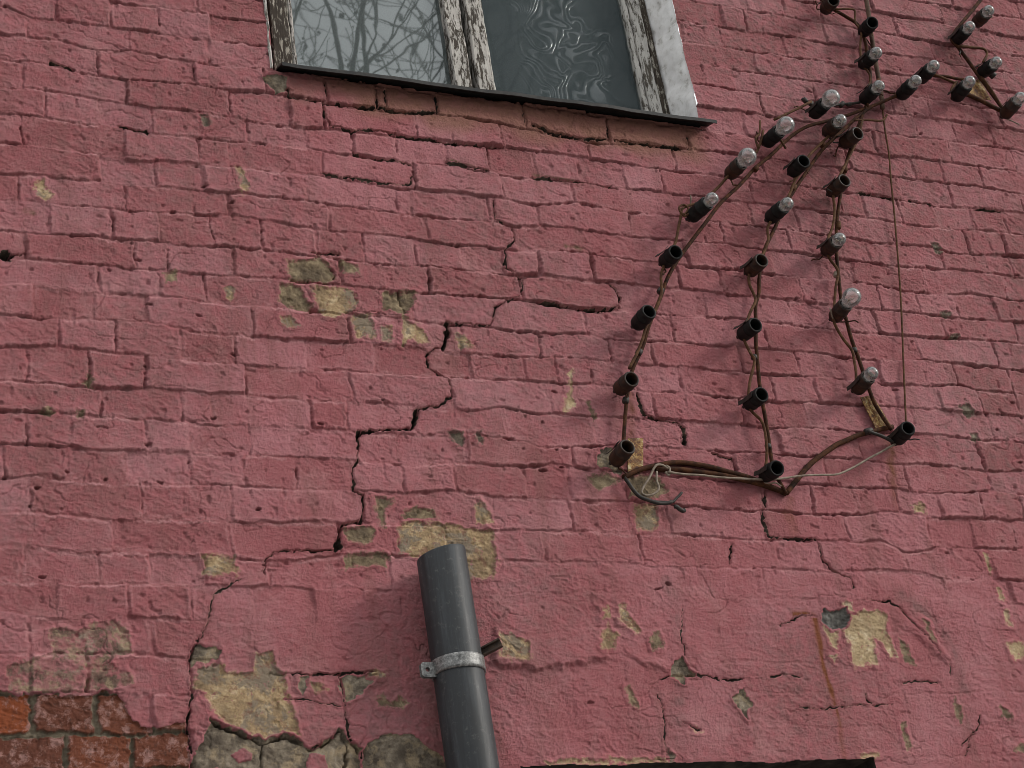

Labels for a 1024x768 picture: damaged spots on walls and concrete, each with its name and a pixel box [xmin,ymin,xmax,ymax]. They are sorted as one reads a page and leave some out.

peeling [274,248,478,355]
crack [185,198,525,760]
peeling [337,492,503,583]
peeling [0,616,446,768]
peeling [494,626,535,669]
peeling [596,598,697,686]
spalling [731,686,755,722]
crack [656,488,953,755]
peeling [820,598,919,673]